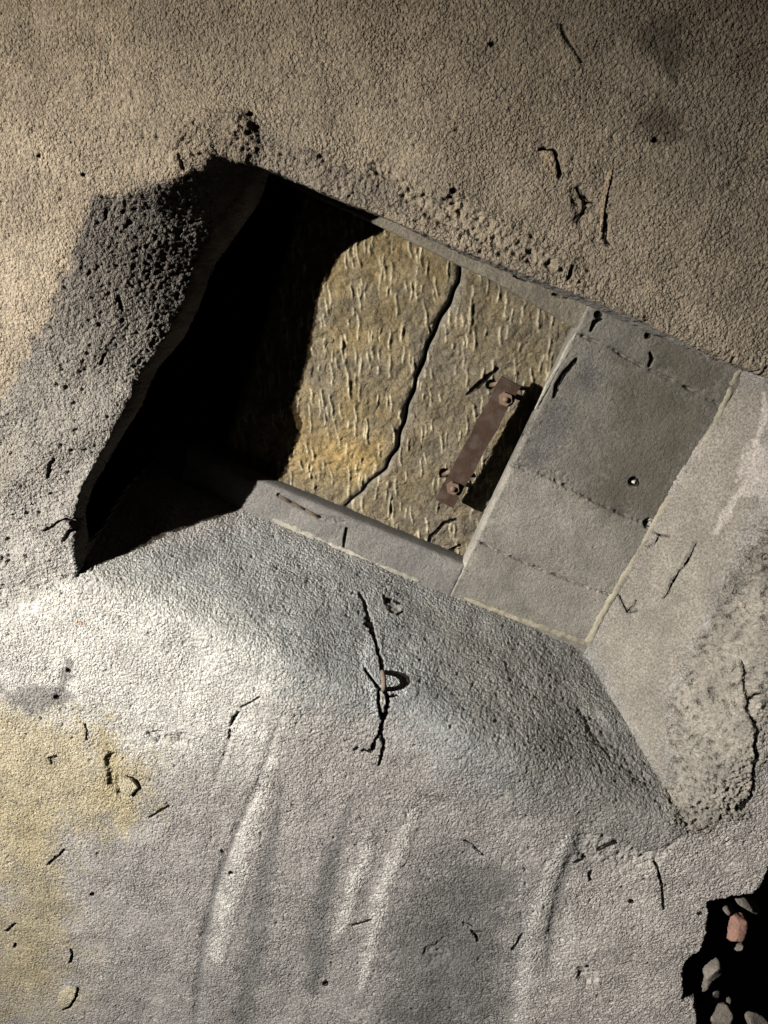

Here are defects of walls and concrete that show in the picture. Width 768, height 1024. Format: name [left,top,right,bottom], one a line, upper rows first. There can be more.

crack [540,148,609,245]
crack [362,268,461,490]
crack [663,543,696,599]
crack [355,593,403,765]
crack [738,661,759,811]